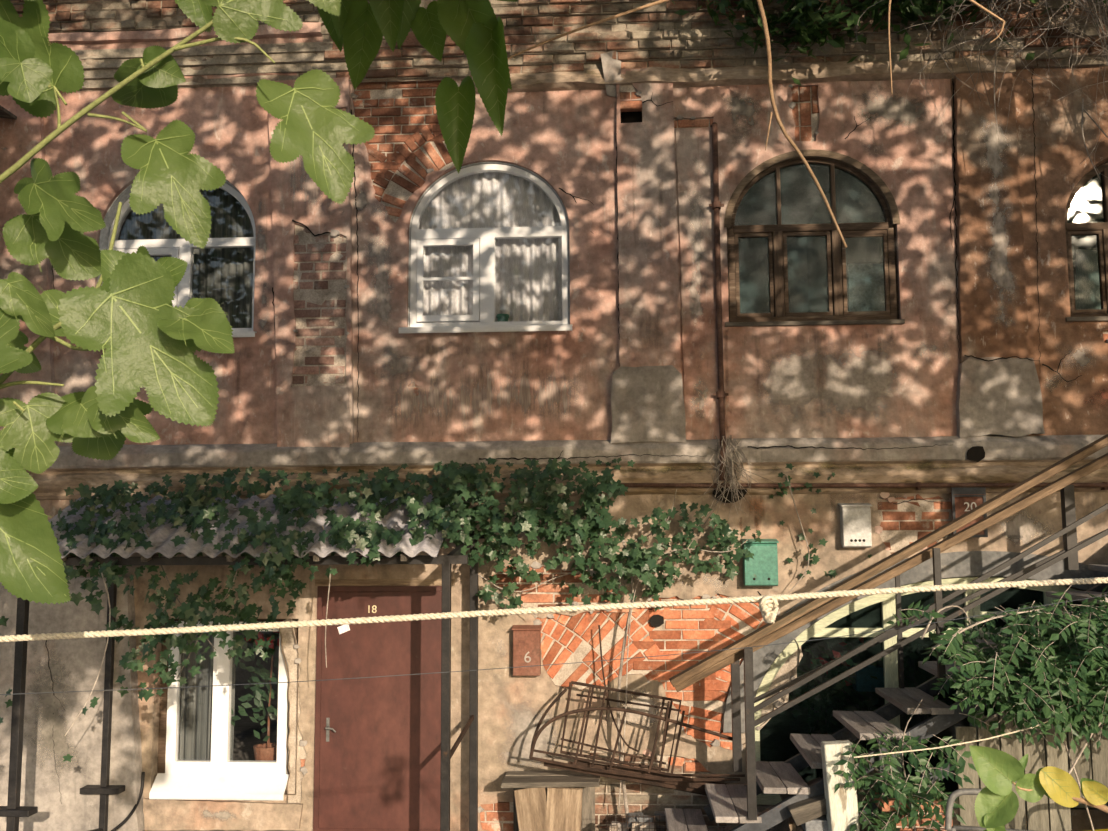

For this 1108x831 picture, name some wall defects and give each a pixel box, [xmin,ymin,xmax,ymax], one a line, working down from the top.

flaking render [336,80,454,223]
flaking render [788,84,819,141]
crack [950,74,1082,388]
flaking render [292,223,350,387]
flaking render [875,492,952,554]
flaking render [486,561,803,751]
flaking render [590,749,731,831]